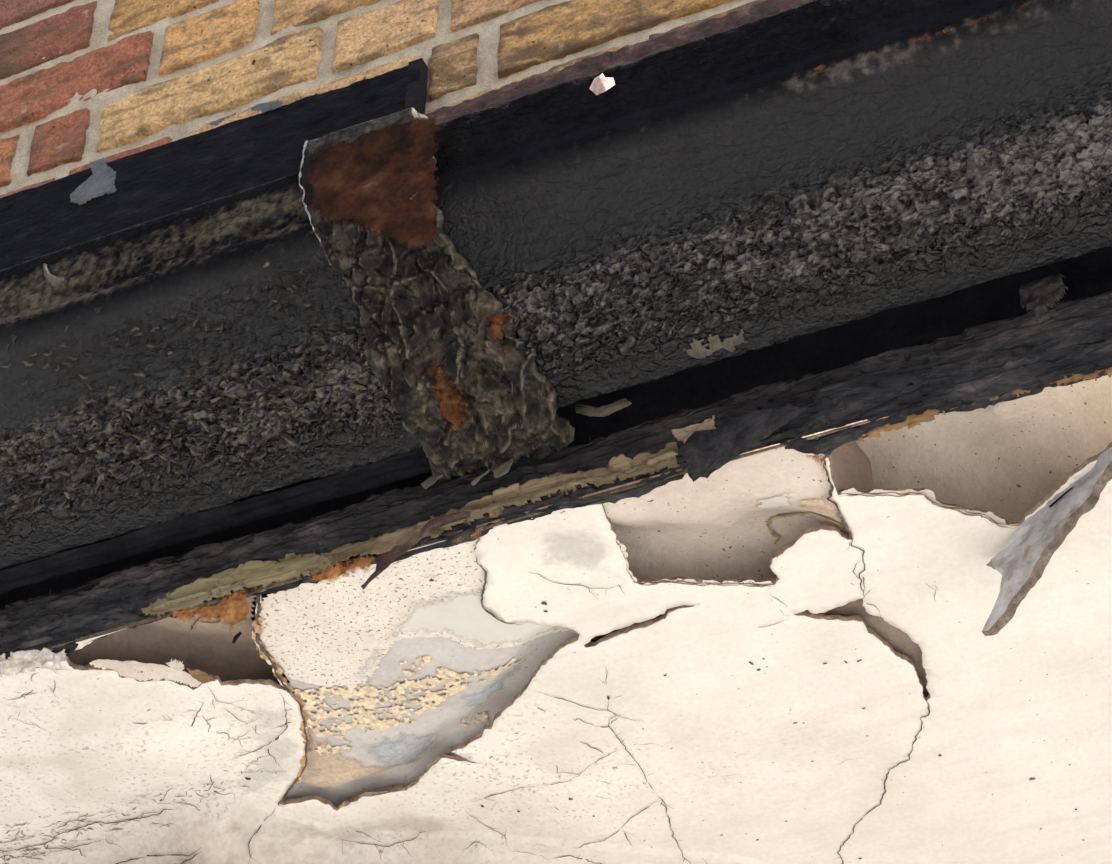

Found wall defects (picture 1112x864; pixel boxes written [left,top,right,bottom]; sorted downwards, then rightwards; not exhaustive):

corrosion [308,116,440,247]
corrosion [430,362,469,431]
corrosion [484,312,516,353]
spalling [603,375,1112,636]
crack [8,661,70,731]
spalling [68,511,599,809]
spalling [806,598,930,697]
crack [0,686,292,864]
crack [342,831,426,860]
crack [833,700,930,864]